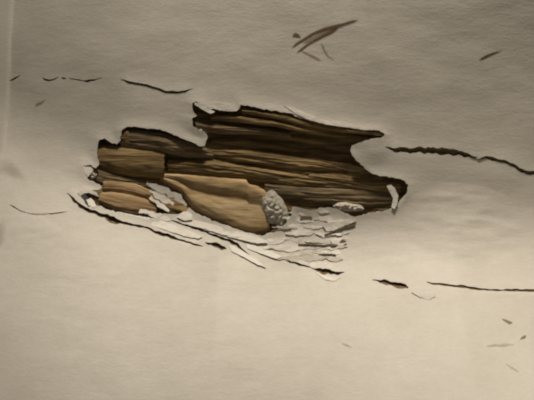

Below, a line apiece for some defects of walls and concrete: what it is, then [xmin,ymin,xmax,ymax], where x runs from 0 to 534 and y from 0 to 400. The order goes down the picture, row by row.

crack [42,76,102,84]
crack [121,79,193,94]
crack [386,146,534,175]
spalling [78,102,408,268]
crack [373,279,534,300]